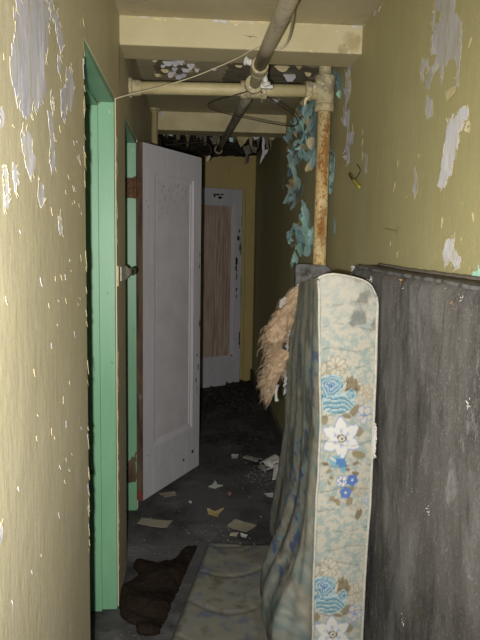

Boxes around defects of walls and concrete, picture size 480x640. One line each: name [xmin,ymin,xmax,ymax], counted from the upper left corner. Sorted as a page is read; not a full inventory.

peeling [2,0,75,237]
peeling [152,60,199,80]
peeling [282,96,317,267]
peeling [420,0,472,120]
peeling [437,105,470,192]
peeling [433,232,480,277]